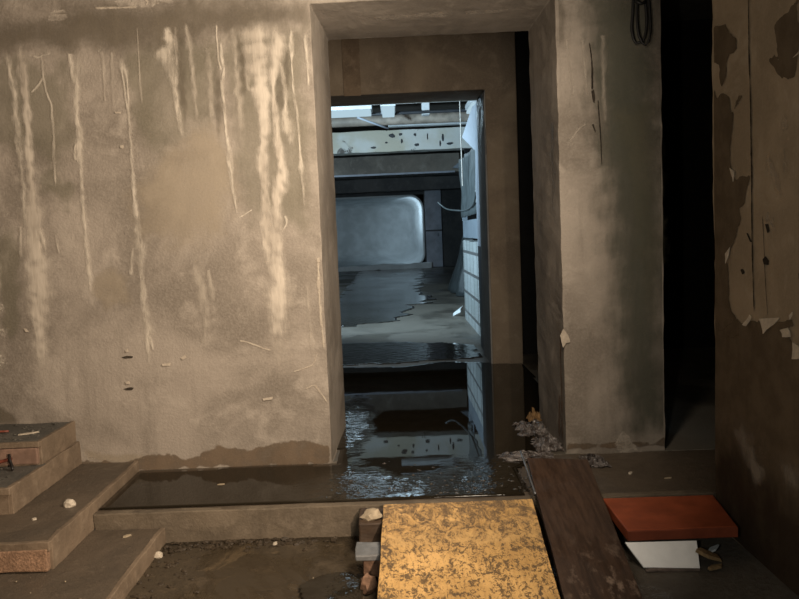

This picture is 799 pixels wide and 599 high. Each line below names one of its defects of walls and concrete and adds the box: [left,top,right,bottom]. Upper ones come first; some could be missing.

leakage [0,8,304,364]
leakage [129,441,329,470]
peeling [714,24,799,562]
peeling [769,0,799,79]